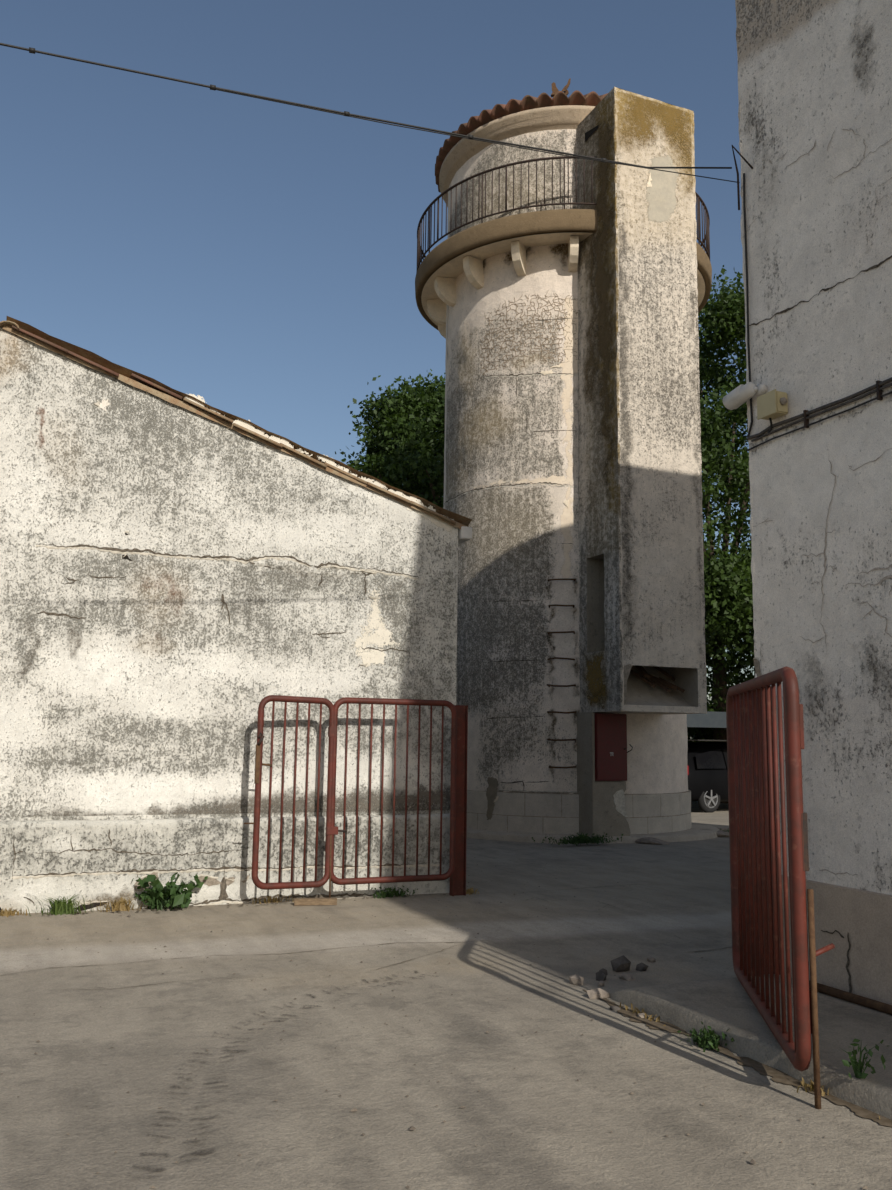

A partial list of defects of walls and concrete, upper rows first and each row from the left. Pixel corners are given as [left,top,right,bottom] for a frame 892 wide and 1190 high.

crack [749,255,892,326]
water stain [619,229,633,635]
crack [36,544,420,594]
crack [800,446,892,649]
crack [36,611,86,621]
crack [221,594,230,624]
crack [583,989,892,1127]